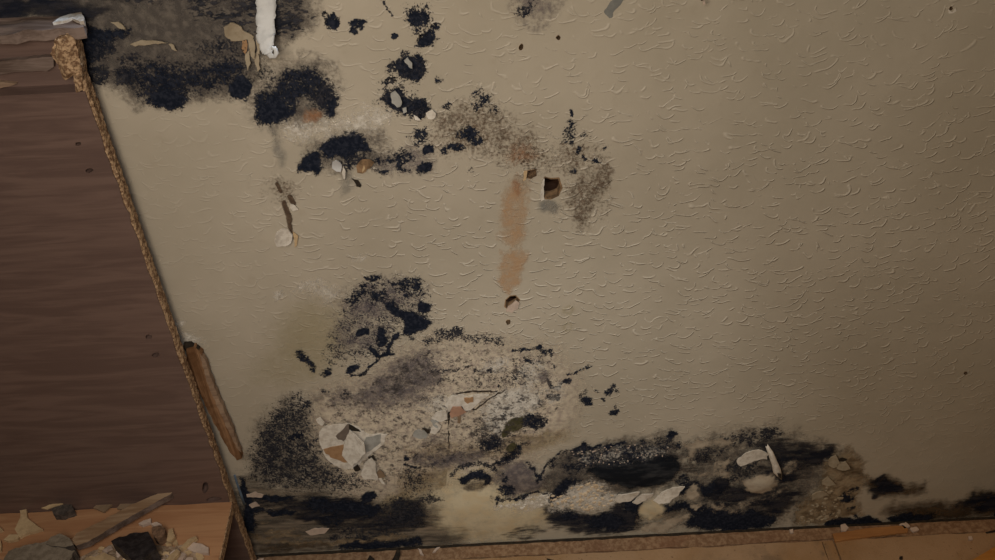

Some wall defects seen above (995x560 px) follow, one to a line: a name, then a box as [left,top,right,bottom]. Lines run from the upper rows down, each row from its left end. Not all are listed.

water stain [513,0,550,18]
water stain [0,0,367,127]
water stain [297,1,540,177]
spalling [523,169,563,201]
water stain [561,109,611,224]
flaking render [413,393,489,439]
water stain [237,274,841,553]
flaking render [316,417,387,485]
flaking render [737,444,782,480]
flaking render [496,481,685,520]
water stain [824,474,995,526]